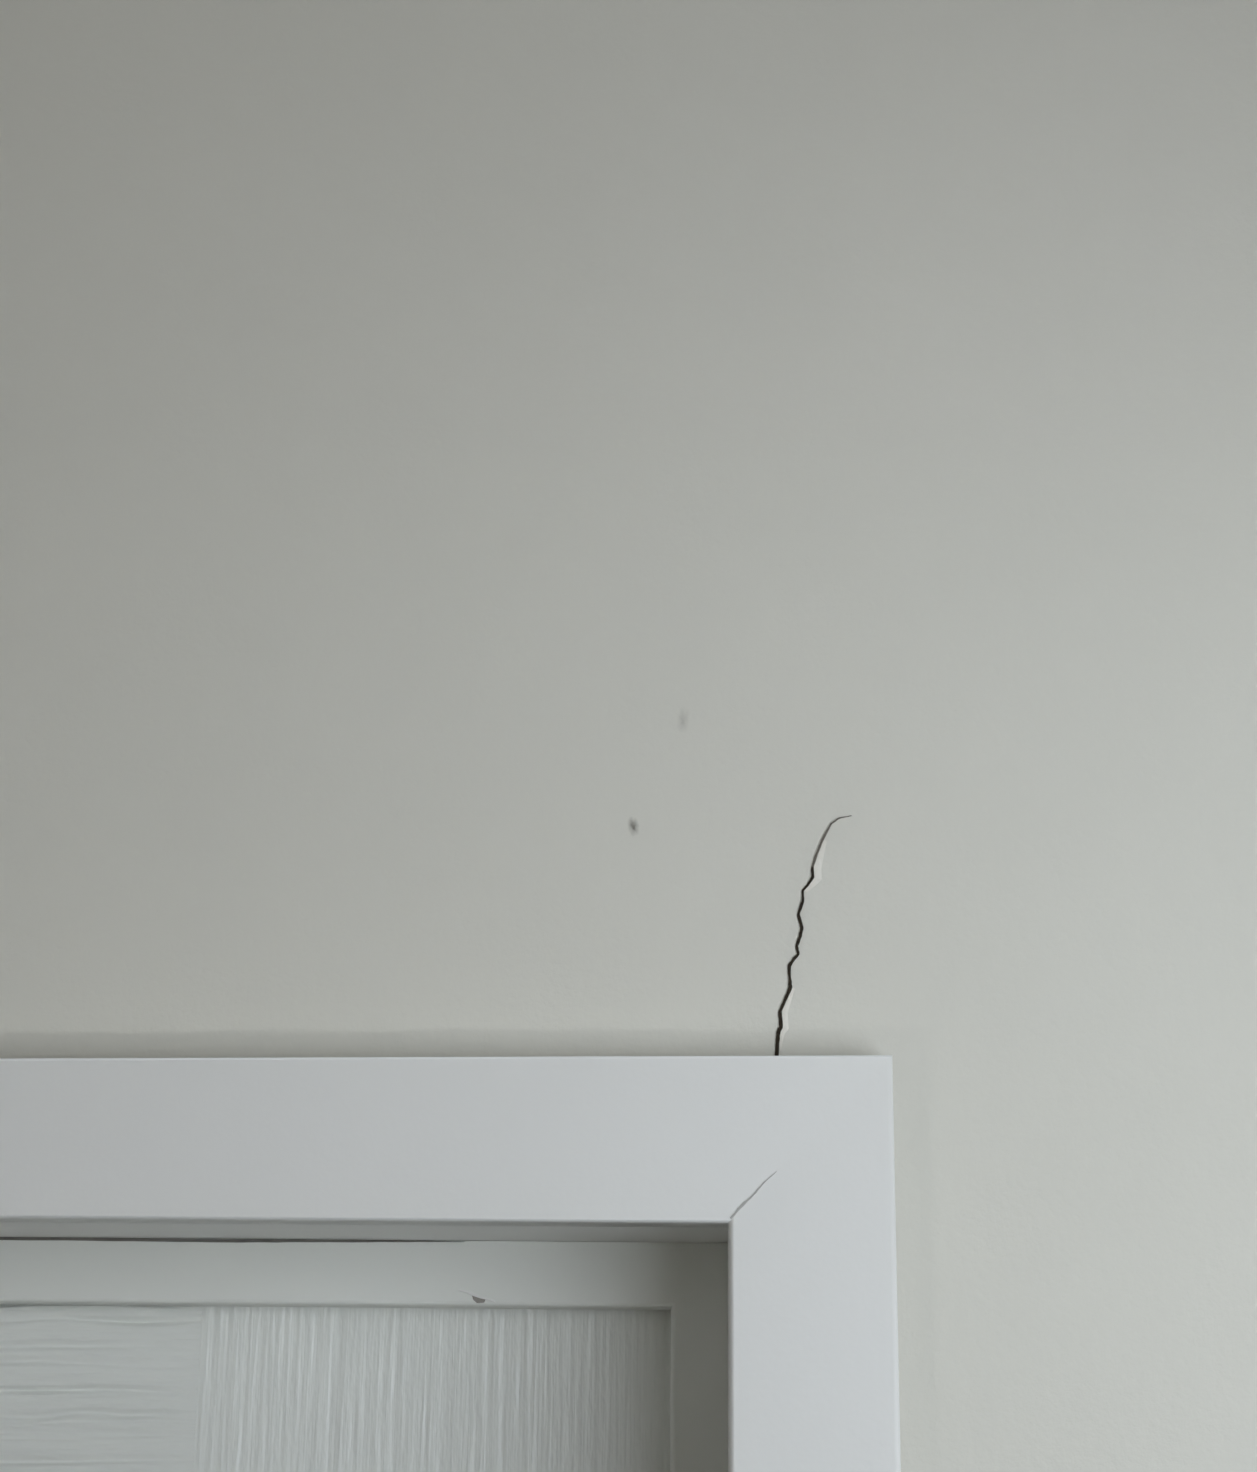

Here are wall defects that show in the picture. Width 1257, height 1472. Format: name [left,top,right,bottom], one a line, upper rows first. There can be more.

crack [775,815,852,1056]